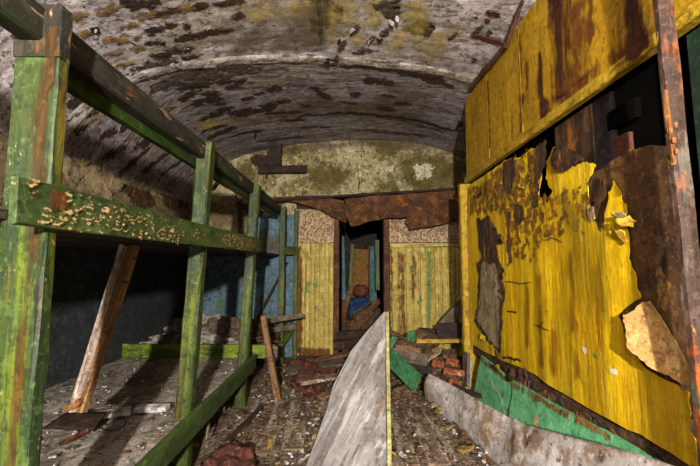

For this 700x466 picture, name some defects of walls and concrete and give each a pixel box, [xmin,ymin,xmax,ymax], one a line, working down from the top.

leakage [234,0,355,53]
corrosion [538,0,600,118]
corrosion [608,0,654,65]
mould [309,166,349,190]
leakage [356,140,467,192]
peeling [610,212,637,244]
peeling [469,140,611,441]